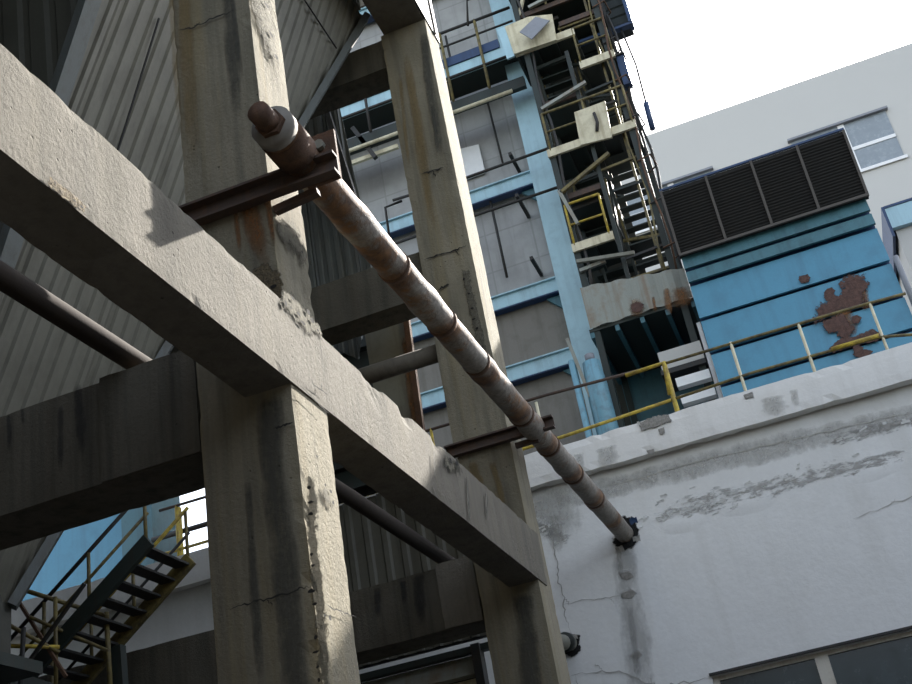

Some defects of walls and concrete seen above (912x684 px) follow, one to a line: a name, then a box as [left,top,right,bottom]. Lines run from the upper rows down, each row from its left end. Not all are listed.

spalling [249,0,279,73]
spalling [253,264,322,338]
rust [631,288,691,313]
rust [813,273,880,358]
peeling [613,451,903,553]
spalling [306,476,334,684]
crack [549,533,628,632]